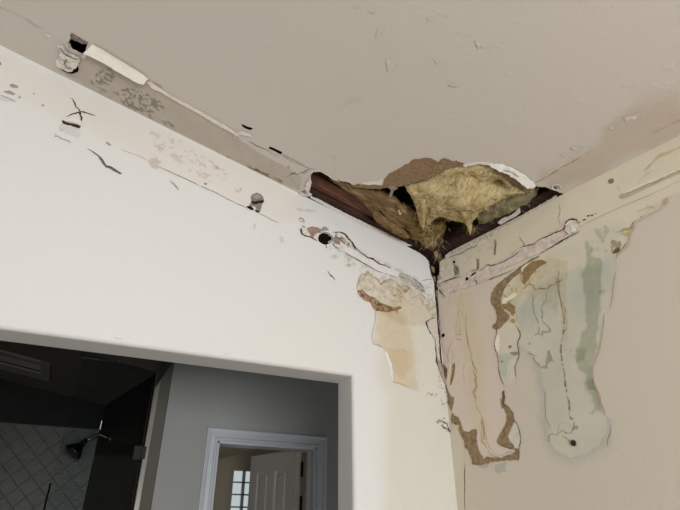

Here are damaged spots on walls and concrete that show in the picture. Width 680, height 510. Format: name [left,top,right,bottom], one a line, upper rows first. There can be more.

crack [68,98,95,122]
peeling [56,33,239,137]
crack [87,148,123,174]
flaking render [247,193,264,212]
flaking render [299,170,412,249]
crack [340,206,578,385]
peeling [438,136,680,458]